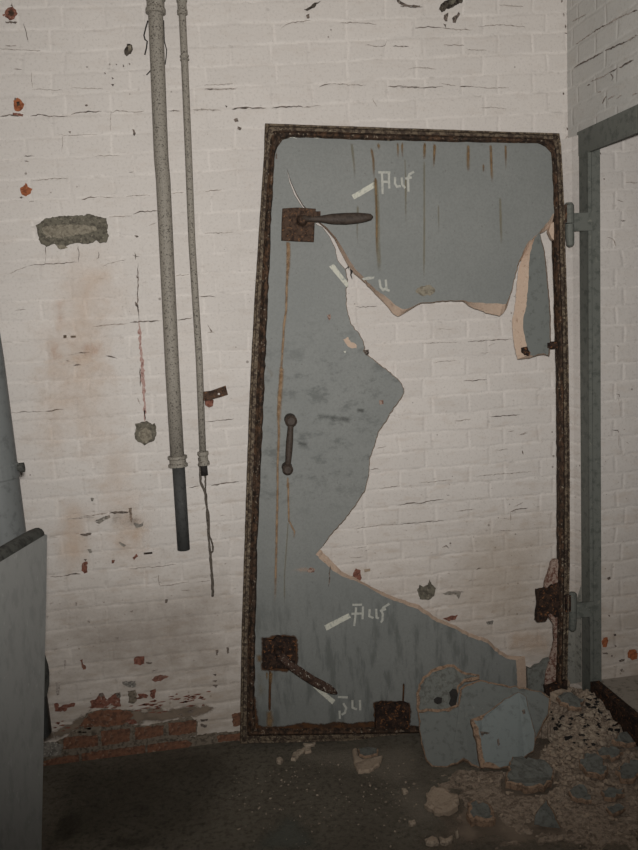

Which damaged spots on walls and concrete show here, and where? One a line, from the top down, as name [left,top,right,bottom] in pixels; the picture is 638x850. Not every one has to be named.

spalling [439,0,463,27]
peeling [36,214,109,249]
peeling [343,337,369,355]
rust [275,243,295,594]
spalling [417,580,461,600]
rust [254,635,417,729]
peeling [43,656,240,766]